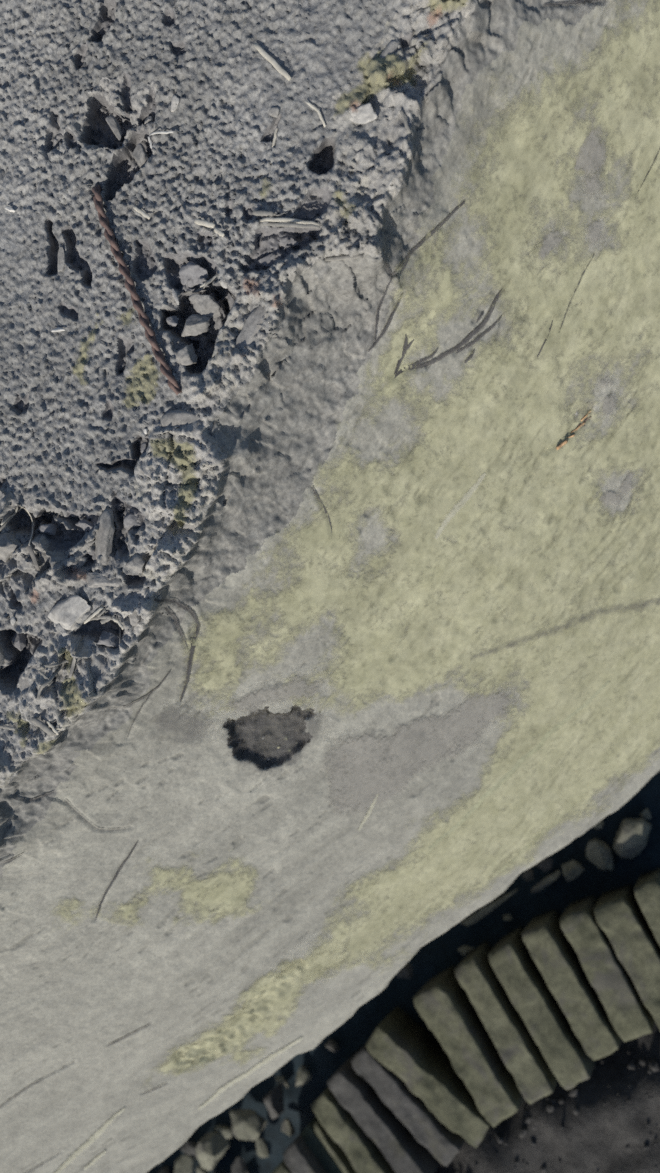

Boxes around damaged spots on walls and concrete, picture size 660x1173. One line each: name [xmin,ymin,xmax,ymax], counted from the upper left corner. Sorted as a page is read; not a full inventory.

crack [368,201,502,379]
spalling [0,0,607,878]
crack [113,598,200,732]